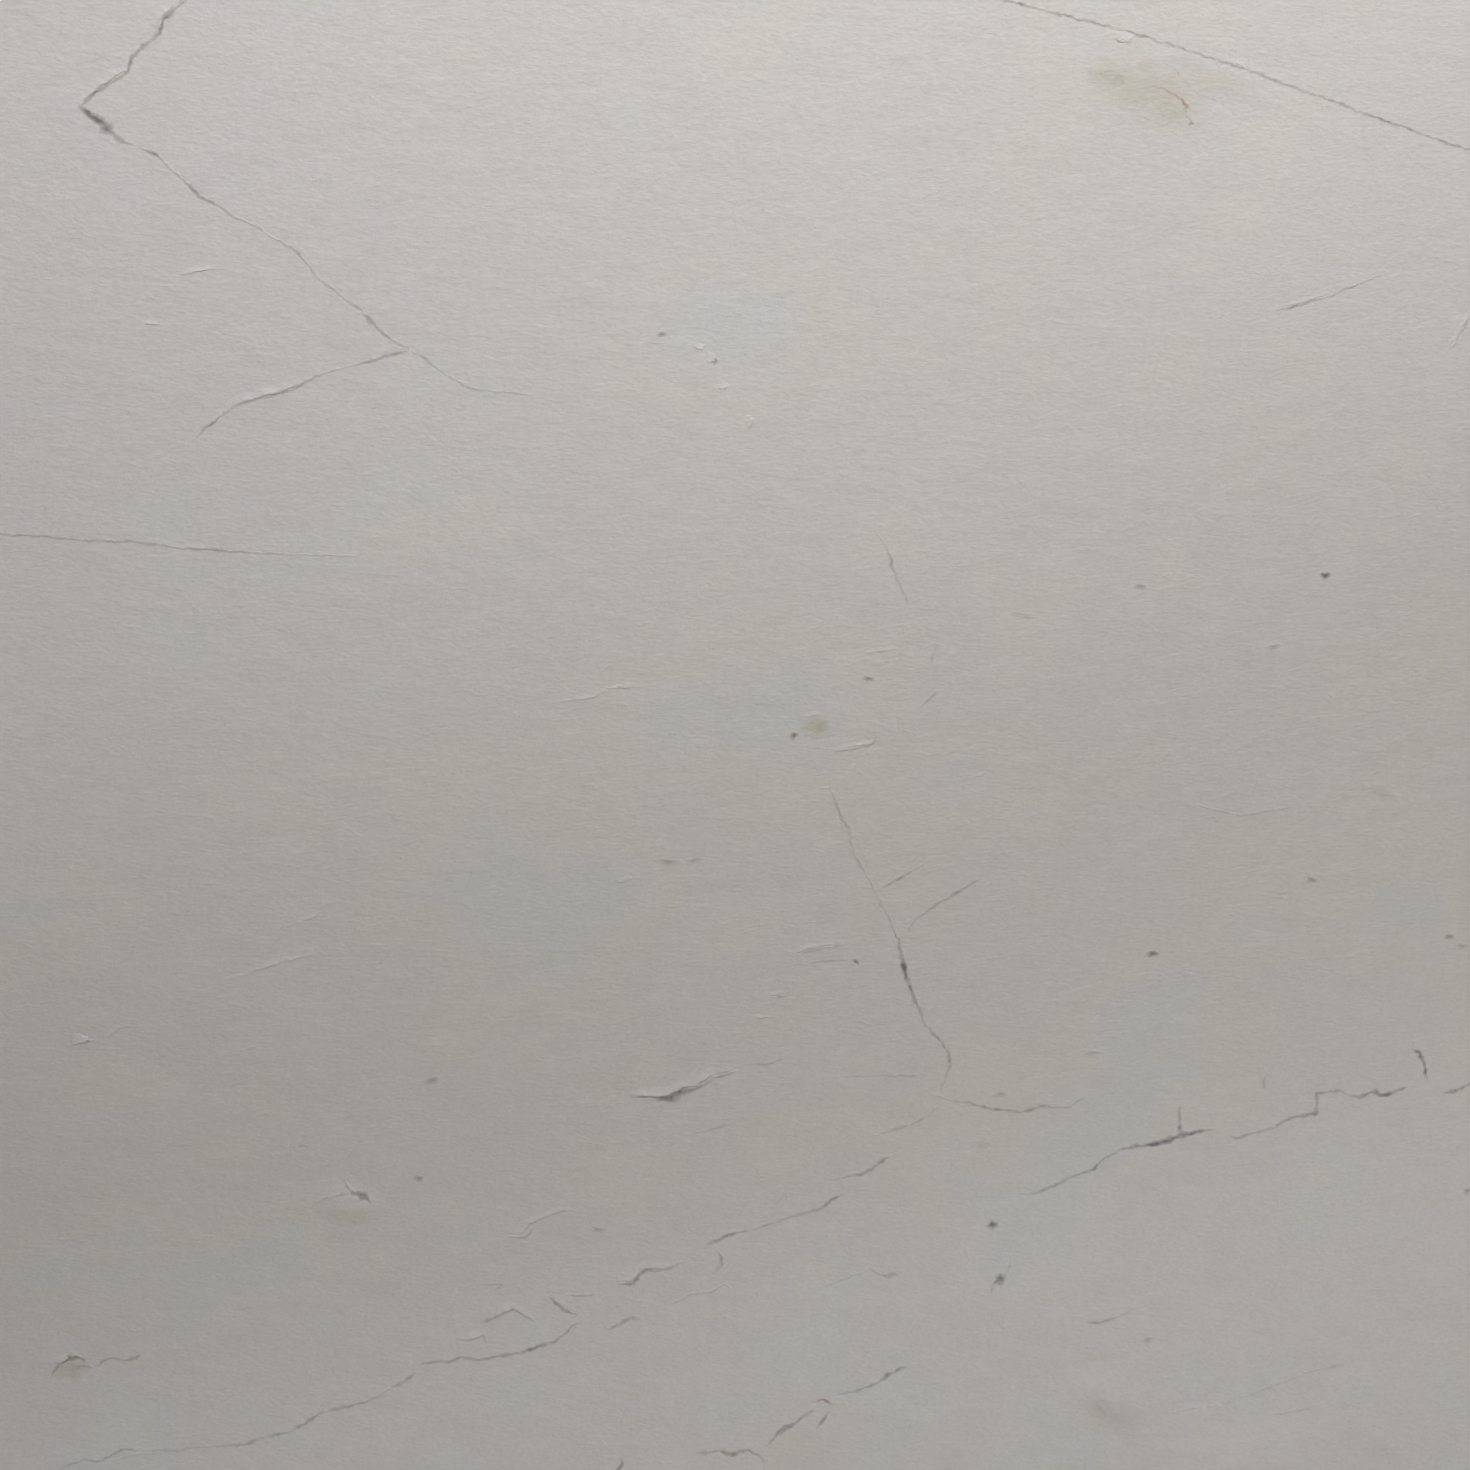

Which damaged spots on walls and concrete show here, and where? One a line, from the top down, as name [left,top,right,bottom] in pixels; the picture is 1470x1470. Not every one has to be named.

crack [999,0,1470,151]
crack [76,0,534,441]
crack [1276,274,1381,311]
peeling [624,1055,790,1103]
crack [706,787,1085,1245]
crack [1014,1038,1470,1195]
crack [57,1372,415,1470]